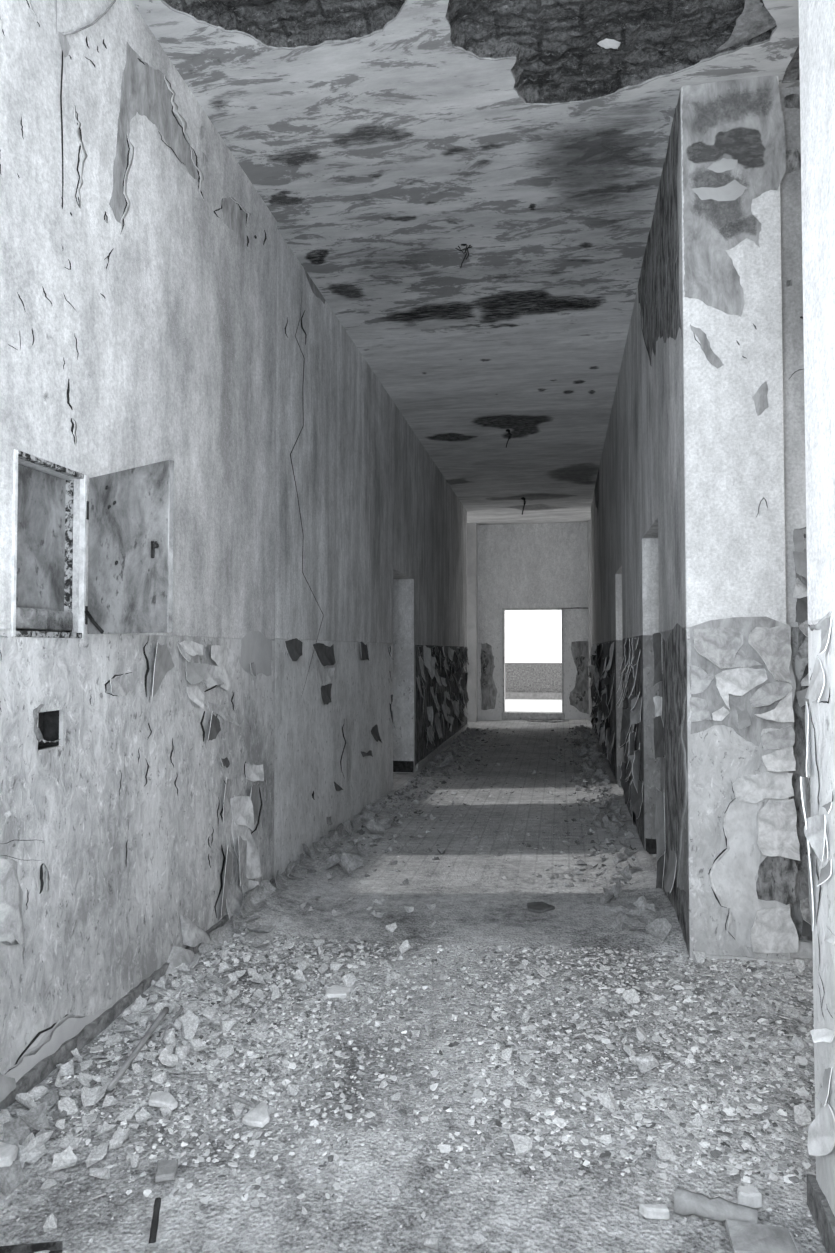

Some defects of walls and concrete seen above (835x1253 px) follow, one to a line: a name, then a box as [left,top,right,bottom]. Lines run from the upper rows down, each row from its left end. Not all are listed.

spalling [160,0,408,50]
spalling [445,0,778,106]
peeling [105,42,208,235]
damp [266,150,322,165]
damp [333,123,409,147]
damp [269,191,304,205]
peeling [638,93,724,369]
damp [330,284,363,298]
damp [386,277,605,328]
damp [430,415,552,441]
peeling [415,643,497,766]
peeling [569,527,835,954]